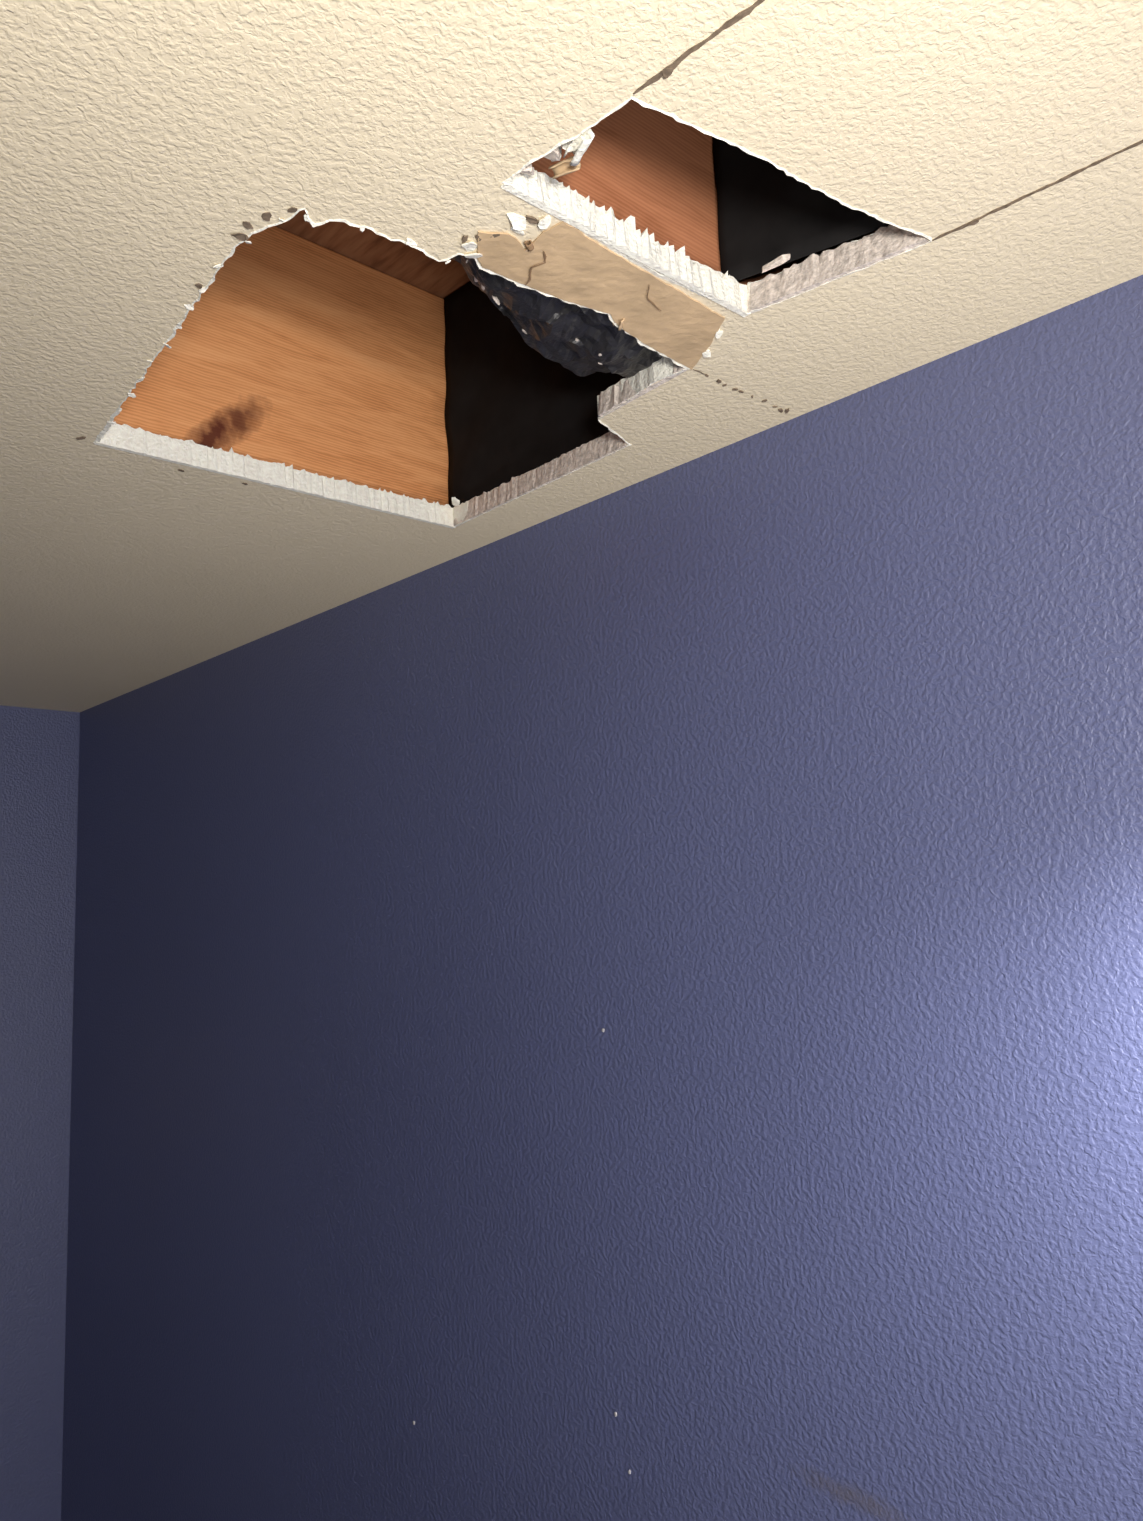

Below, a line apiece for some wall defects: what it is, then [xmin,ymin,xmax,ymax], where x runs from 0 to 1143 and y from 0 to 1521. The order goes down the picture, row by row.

crack [633,0,765,94]
crack [932,140,1143,241]
peeling [445,213,725,370]